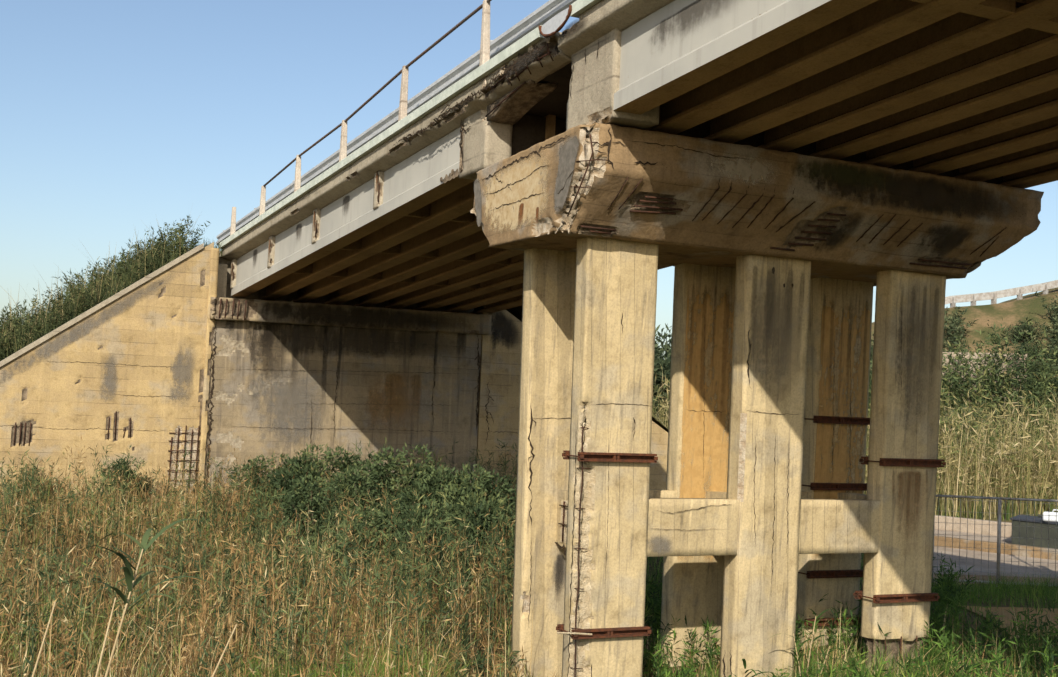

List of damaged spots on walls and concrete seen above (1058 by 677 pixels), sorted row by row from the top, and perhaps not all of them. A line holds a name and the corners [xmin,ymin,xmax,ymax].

spalling [386,30,565,183]
crack [388,38,574,212]
spalling [531,107,619,237]
crack [594,128,815,232]
leakage [798,162,1004,216]
leakage [920,226,969,258]
spalling [10,419,36,447]
leakage [172,354,191,398]
spalling [166,297,293,509]
crack [3,322,592,677]
leakage [247,303,447,442]
spalling [558,402,596,677]